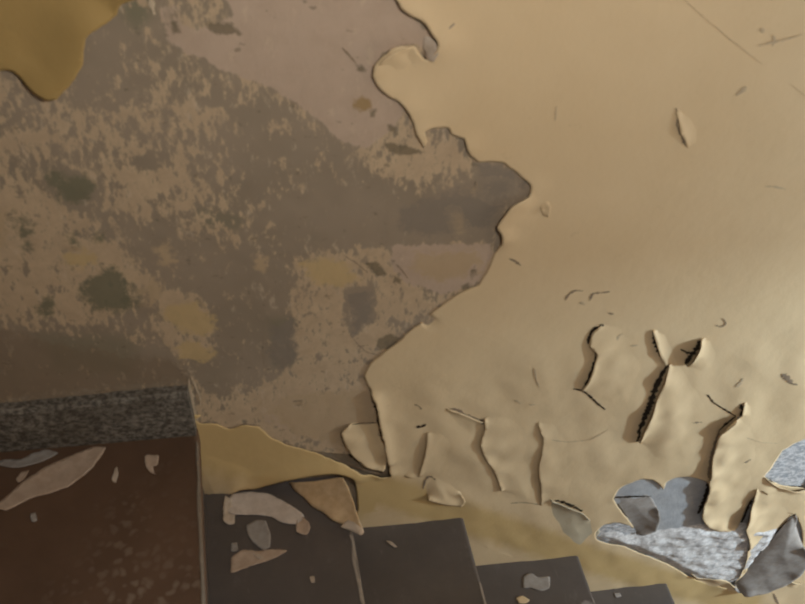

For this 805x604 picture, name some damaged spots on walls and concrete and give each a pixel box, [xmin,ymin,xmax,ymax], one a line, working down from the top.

water stain [0,324,206,403]
peeling [0,0,531,535]
flaking render [480,402,805,597]